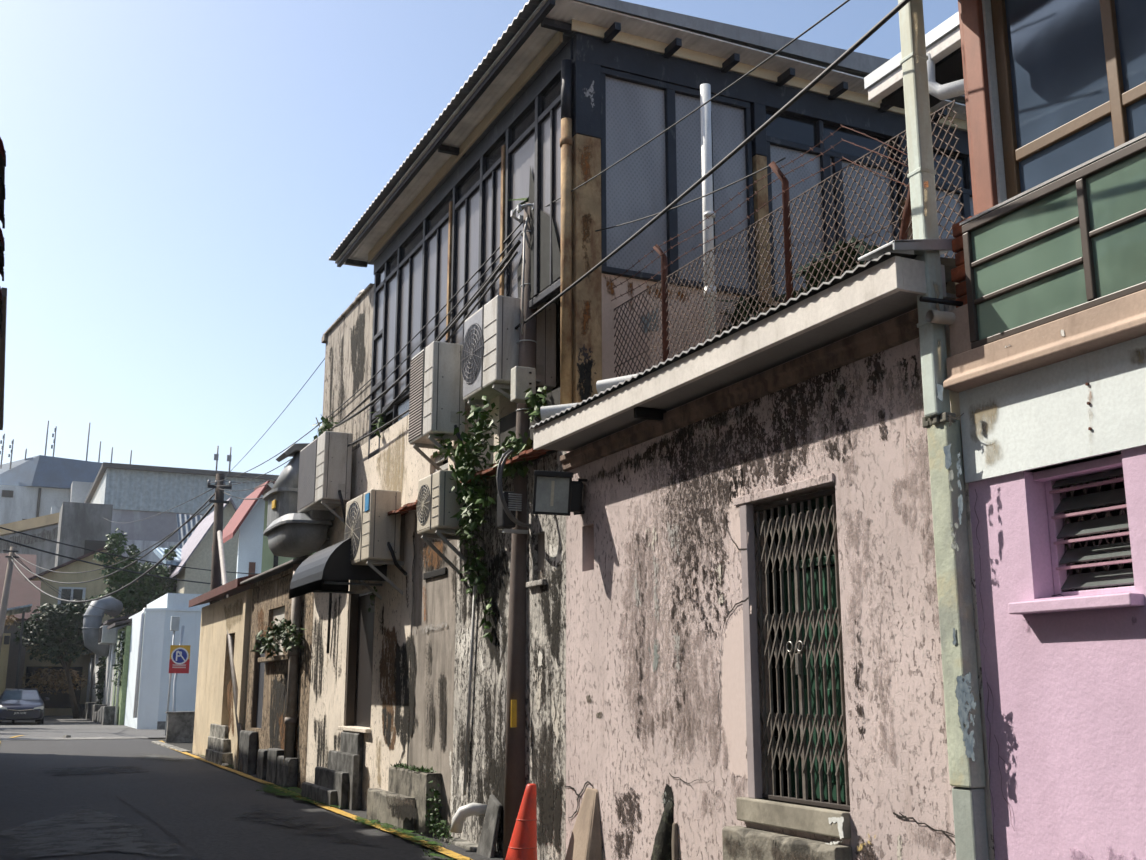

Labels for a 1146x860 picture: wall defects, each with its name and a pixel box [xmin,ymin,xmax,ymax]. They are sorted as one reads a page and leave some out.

damp [329,311,365,431]
damp [224,599,243,629]
damp [258,593,342,767]
damp [420,539,509,842]
damp [583,351,940,860]
peeling [955,672,976,761]
crack [974,490,1015,853]
damp [531,721,563,853]
crack [565,781,593,818]
crack [893,812,955,845]